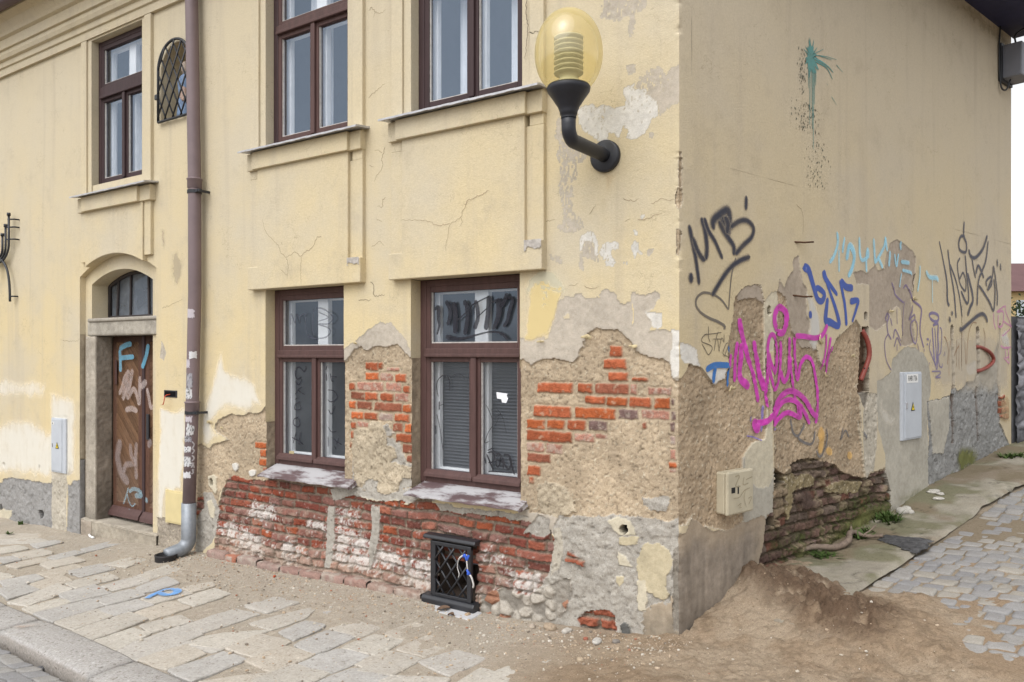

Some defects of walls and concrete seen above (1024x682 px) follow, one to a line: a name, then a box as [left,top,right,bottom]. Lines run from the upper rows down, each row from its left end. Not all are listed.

peeling [577,64,679,142]
crack [371,148,487,249]
spalling [192,239,918,635]